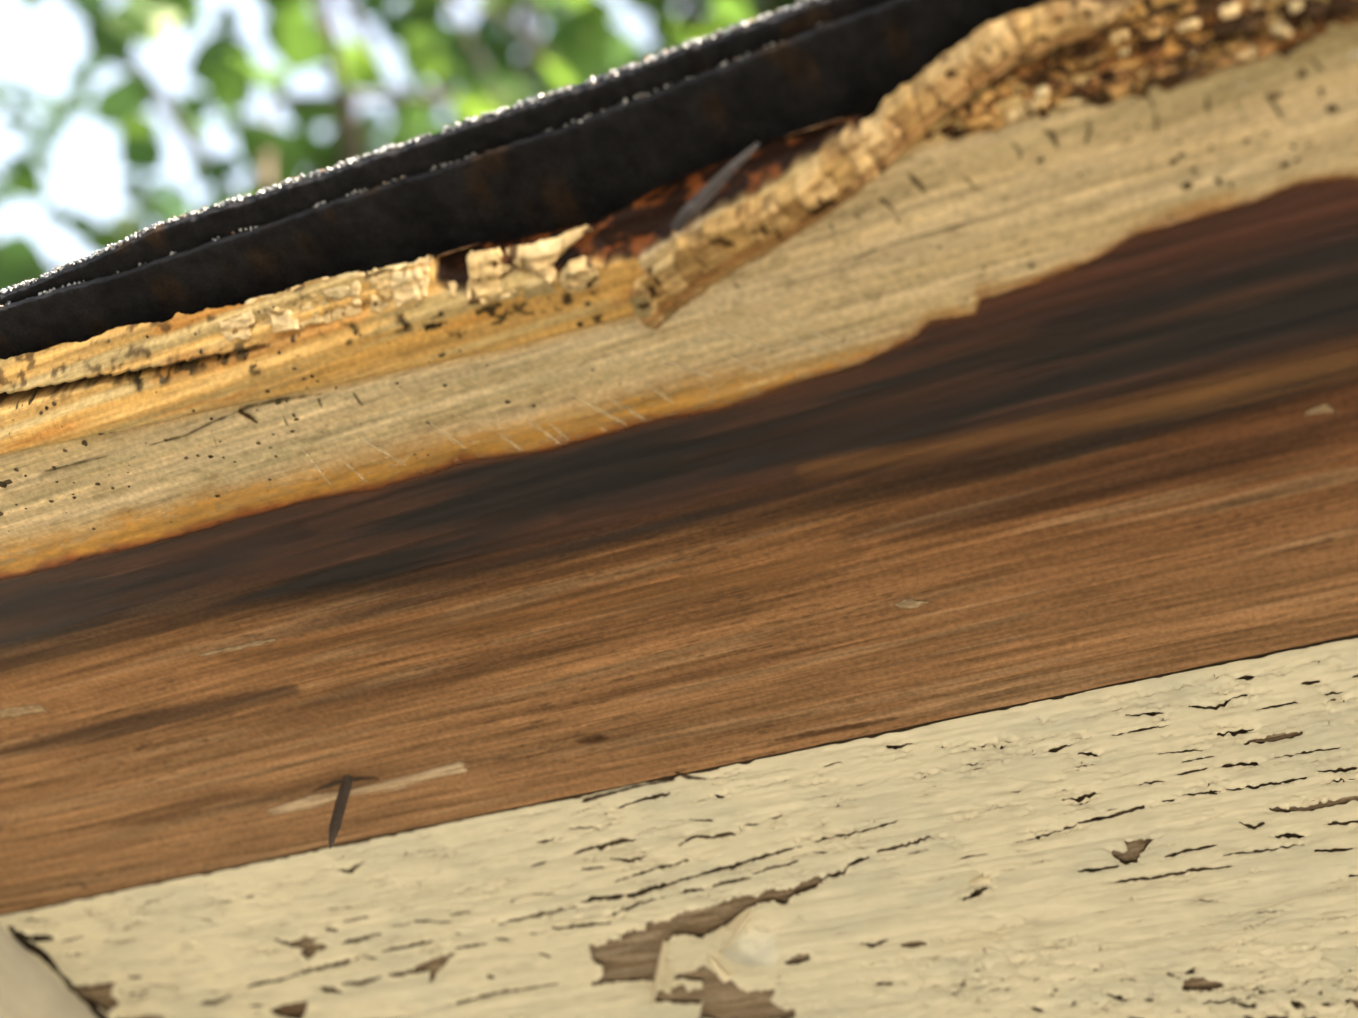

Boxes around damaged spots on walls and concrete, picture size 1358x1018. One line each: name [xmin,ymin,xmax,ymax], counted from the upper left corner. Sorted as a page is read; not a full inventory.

peeling [1219,0,1269,19]
leakage [1318,87,1337,113]
leakage [1168,140,1213,190]
spalling [218,255,434,342]
spalling [448,225,601,305]
leakage [0,177,1358,670]
leakage [784,719,894,739]
crack [1035,675,1358,901]
crack [8,916,149,1018]
crack [204,772,929,1016]
peeling [589,856,869,1018]
crack [1070,967,1316,1018]